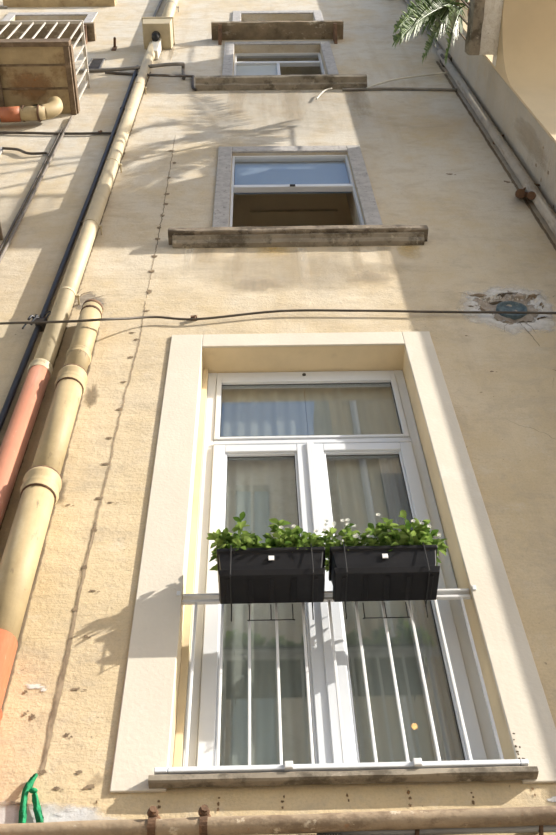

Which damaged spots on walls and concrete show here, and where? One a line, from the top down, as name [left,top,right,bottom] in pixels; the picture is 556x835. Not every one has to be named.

spalling [459,288,554,346]